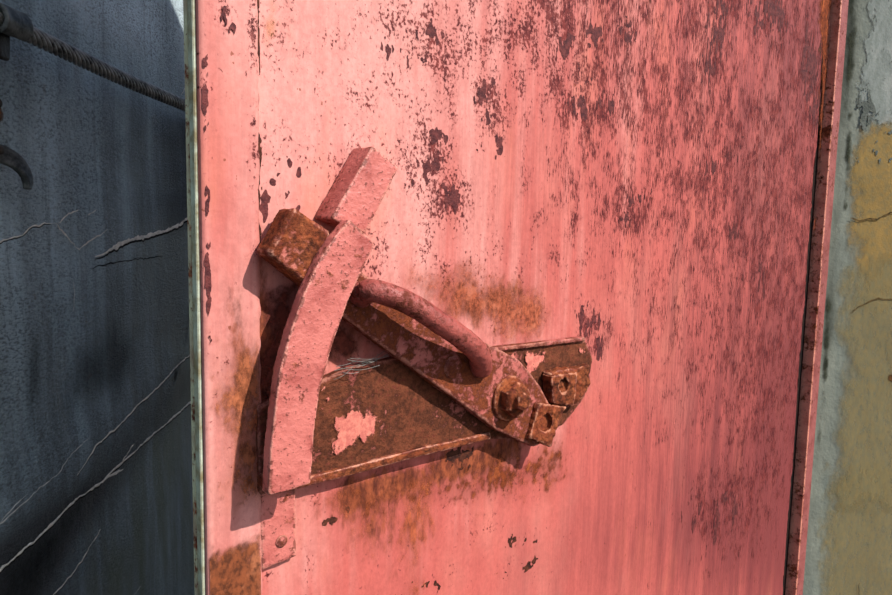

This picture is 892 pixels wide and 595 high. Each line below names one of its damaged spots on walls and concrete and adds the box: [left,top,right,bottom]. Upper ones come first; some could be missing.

corrosion [818,0,830,159]
crack [0,209,187,269]
crack [852,212,892,221]
corrosion [429,270,543,338]
peeling [822,0,892,595]
corrosion [329,324,357,358]
corrosion [216,283,298,494]
crack [0,355,191,573]
corrosion [395,448,565,548]
crack [53,529,101,595]
corrosion [209,536,261,595]